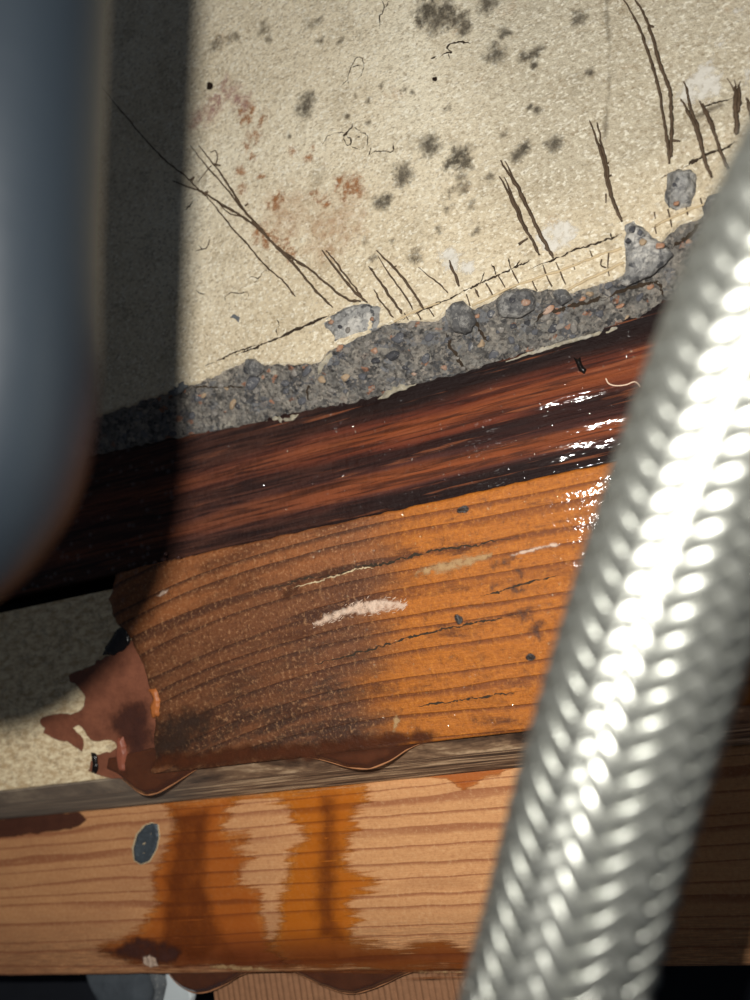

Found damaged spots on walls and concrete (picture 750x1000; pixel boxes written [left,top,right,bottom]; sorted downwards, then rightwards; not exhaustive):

damp [417,0,470,36]
damp [520,48,543,70]
crack [322,123,394,154]
damp [398,166,410,186]
damp [422,136,438,155]
damp [445,146,471,179]
damp [513,143,527,161]
crack [661,141,738,179]
crack [196,270,268,297]
crack [403,233,619,320]
spalling [92,217,702,456]
damp [99,783,471,979]